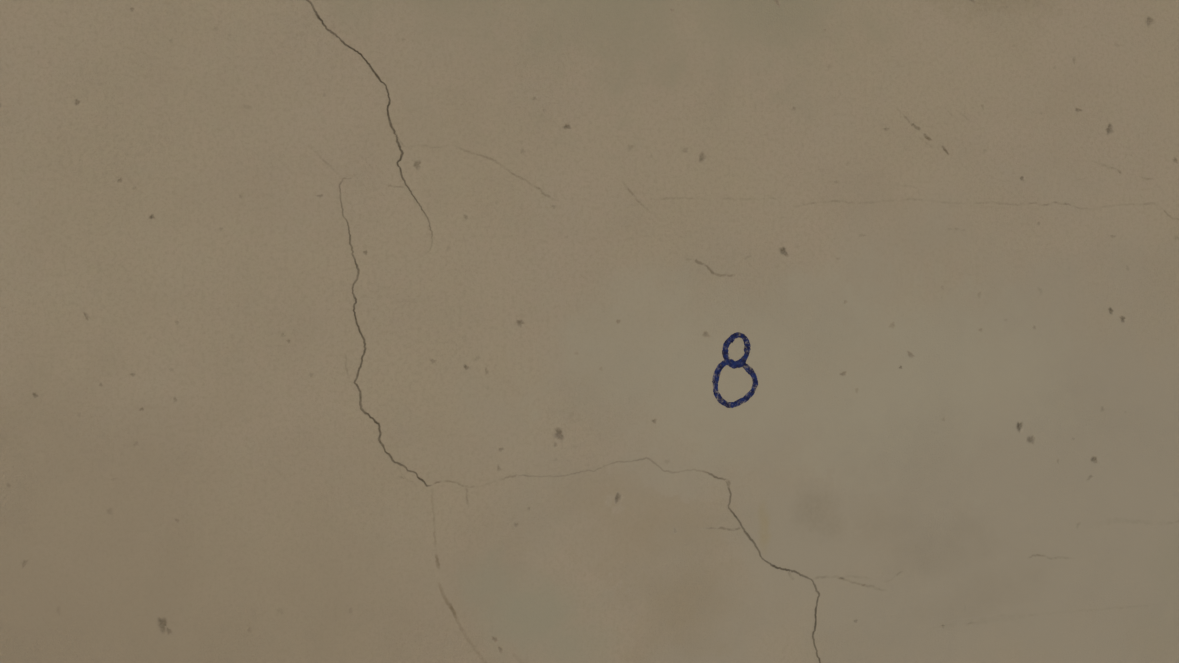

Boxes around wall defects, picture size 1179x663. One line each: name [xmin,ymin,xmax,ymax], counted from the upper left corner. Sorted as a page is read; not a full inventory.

crack [305,0,910,663]